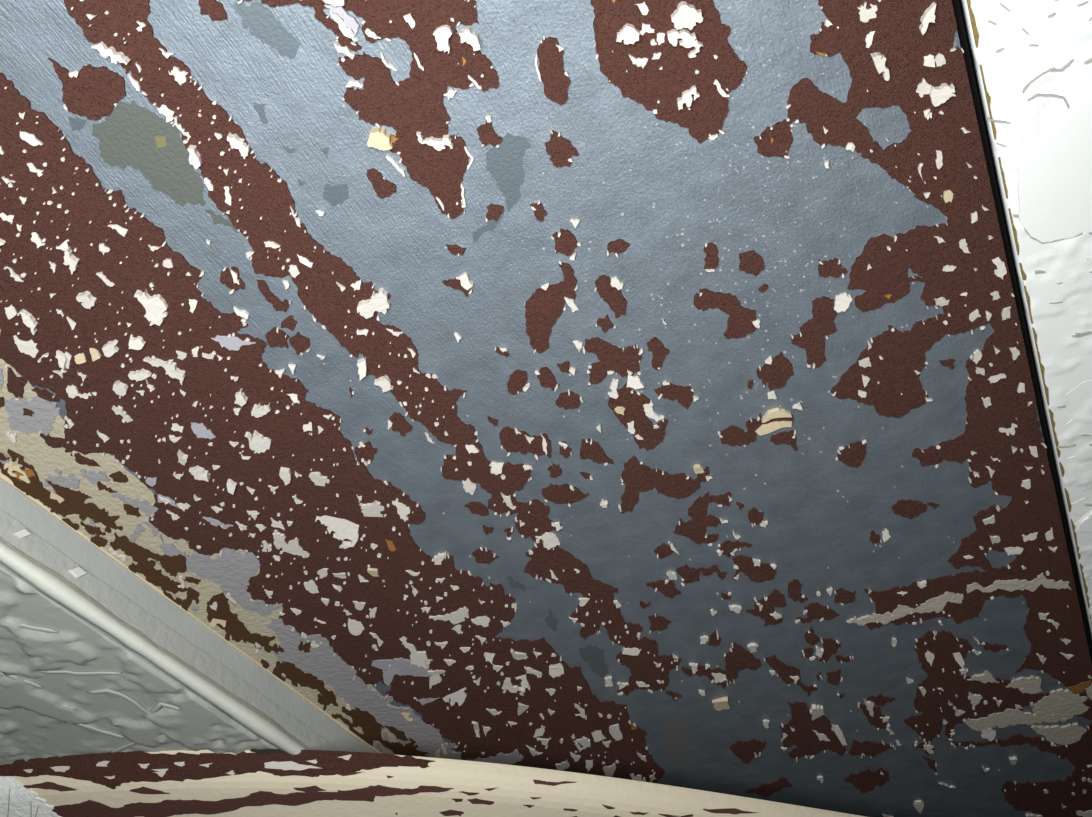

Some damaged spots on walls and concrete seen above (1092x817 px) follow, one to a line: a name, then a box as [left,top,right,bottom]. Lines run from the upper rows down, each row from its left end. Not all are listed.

peeling [616,1,703,68]
peeling [857,2,890,81]
peeling [916,53,956,107]
crack [988,0,1092,109]
crack [985,117,1011,147]
crack [1013,214,1092,273]
peeling [0,305,38,358]
peeling [134,289,168,326]
crack [1034,270,1063,304]
crack [1072,330,1092,338]
peeling [56,336,187,423]
peeling [315,498,411,549]